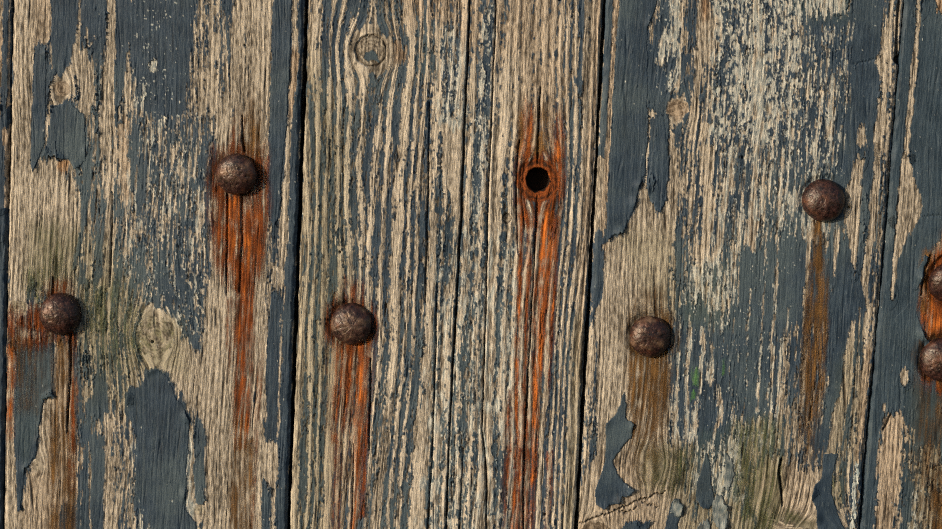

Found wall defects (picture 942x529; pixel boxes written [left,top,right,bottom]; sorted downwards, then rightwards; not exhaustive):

peeling [0,343,66,529]
rust [8,280,76,529]
peeling [0,0,122,380]
rust [207,109,267,529]
peeling [268,0,303,300]
rust [325,286,377,529]
rust [504,112,564,529]
peeling [589,0,674,509]
rust [629,292,673,442]
peeling [870,407,910,529]
peeling [843,0,942,353]
rust [918,249,942,475]